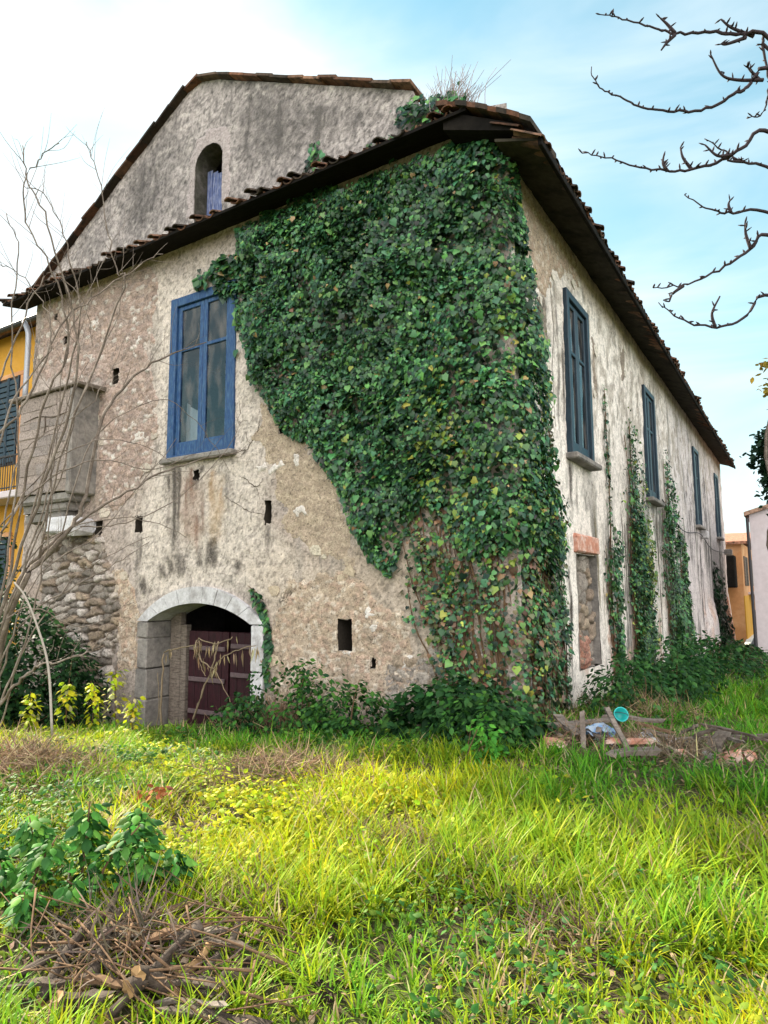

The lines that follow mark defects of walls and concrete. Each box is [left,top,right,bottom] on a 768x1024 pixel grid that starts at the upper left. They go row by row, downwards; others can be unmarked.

leakage [168,467,203,544]
flaking render [576,555,629,686]